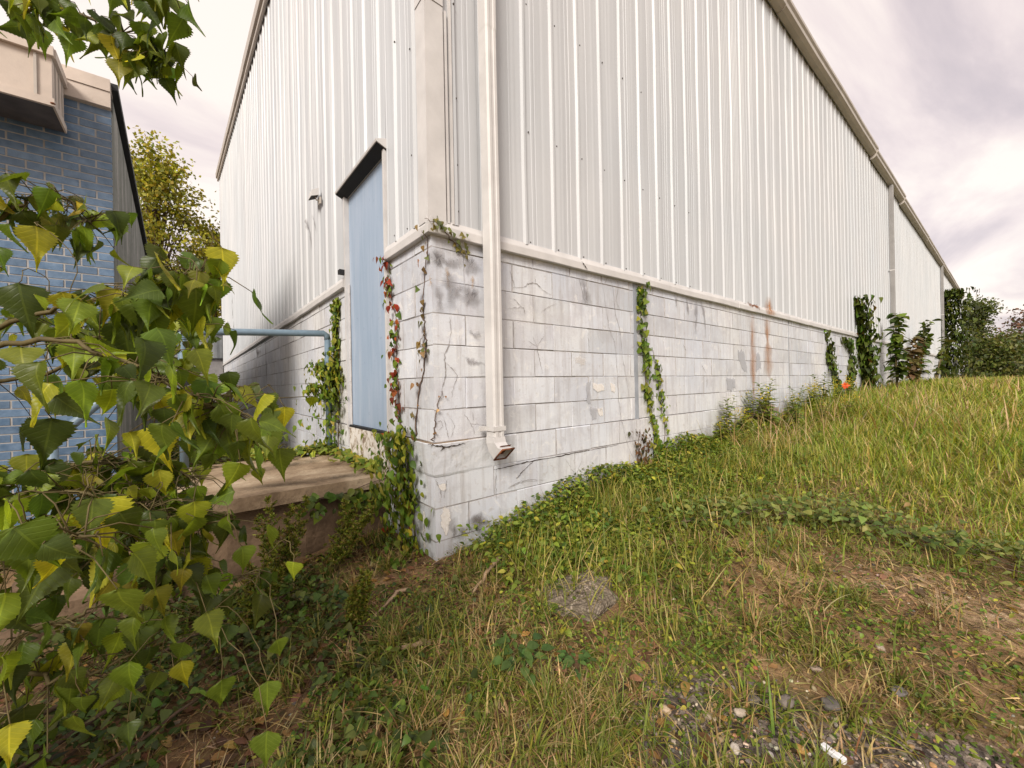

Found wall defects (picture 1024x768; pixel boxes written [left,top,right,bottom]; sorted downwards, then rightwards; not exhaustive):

peeling [586,381,615,420]
crack [494,445,615,499]